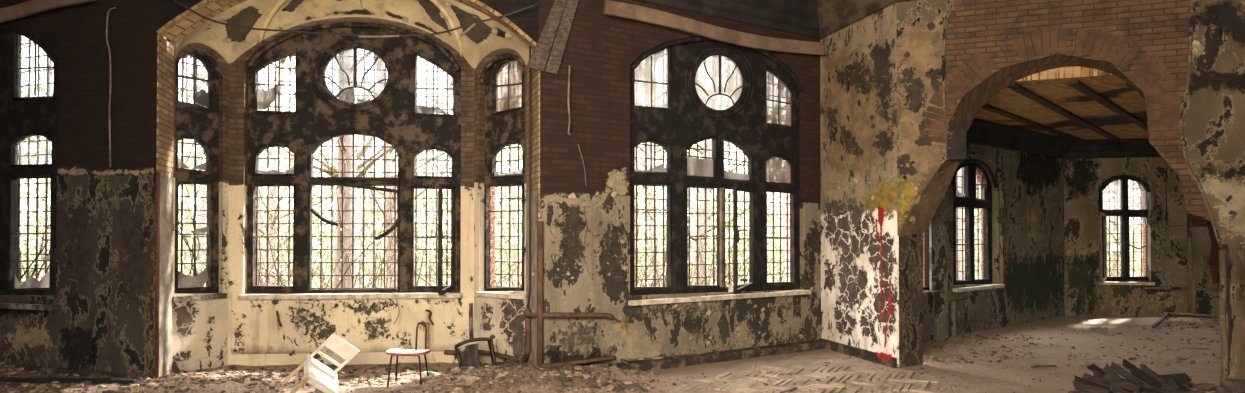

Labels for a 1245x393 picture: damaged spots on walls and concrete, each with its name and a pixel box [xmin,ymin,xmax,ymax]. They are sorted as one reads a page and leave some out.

flaking render [220,5,263,45]
flaking render [282,0,311,20]
flaking render [326,0,512,44]
spalling [58,166,154,178]
peeling [544,172,630,294]
peeling [163,301,215,362]
peeling [231,322,249,354]
peeling [286,298,455,350]
peeling [444,298,534,350]
peeling [550,318,599,356]